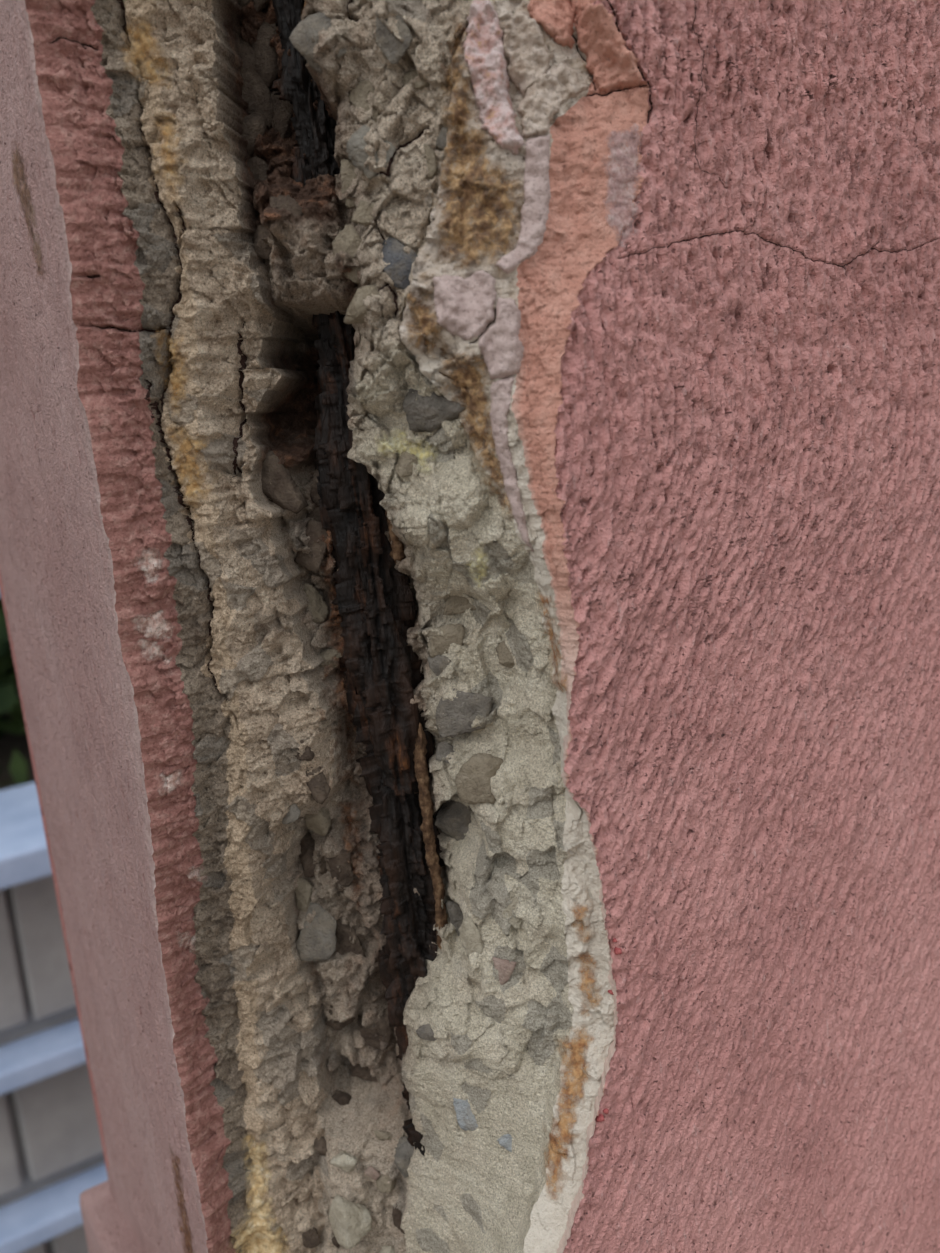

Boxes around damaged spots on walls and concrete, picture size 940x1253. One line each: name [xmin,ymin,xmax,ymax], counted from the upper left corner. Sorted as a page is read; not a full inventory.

crack [118,0,131,46]
rust [437,23,521,266]
crack [618,230,940,276]
crack [95,103,228,701]
rust [406,292,513,517]
spalling [25,0,650,1253]
rust [385,510,406,564]
rust [413,723,448,949]
rust [572,905,598,1013]
rust [545,1029,592,1196]